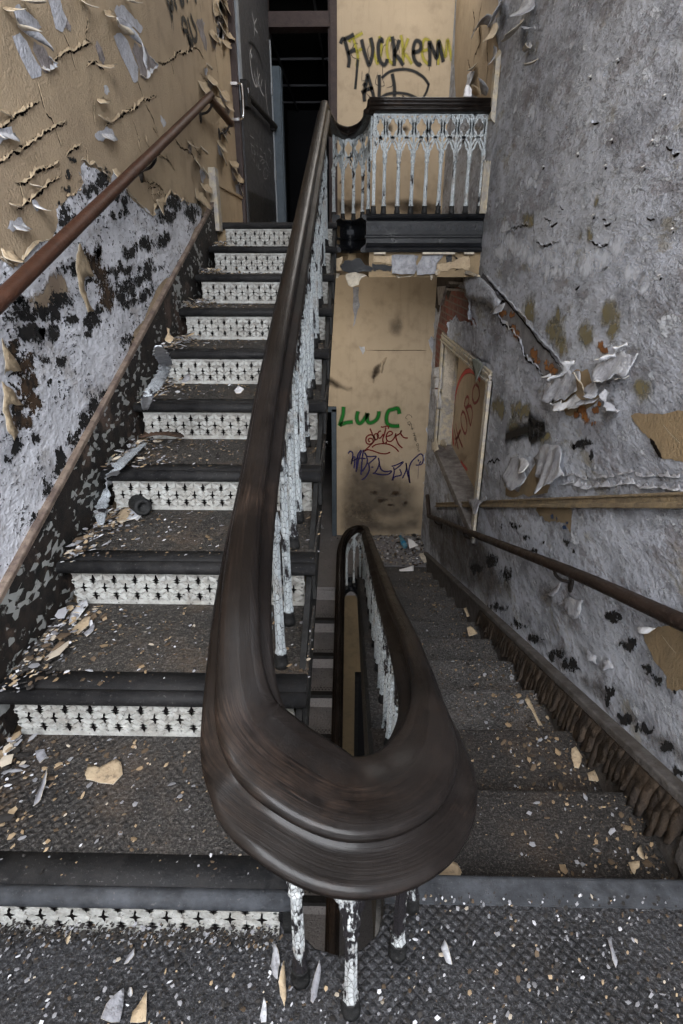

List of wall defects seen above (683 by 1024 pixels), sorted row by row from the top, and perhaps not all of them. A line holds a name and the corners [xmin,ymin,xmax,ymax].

peeling [471,0,538,66]
peeling [0,0,244,581]
flaking render [336,252,500,409]
crack [454,256,562,378]
peeling [540,342,638,416]
peeling [501,444,683,498]
peeling [69,599,95,637]
peeling [548,582,583,619]
peeling [463,607,683,875]